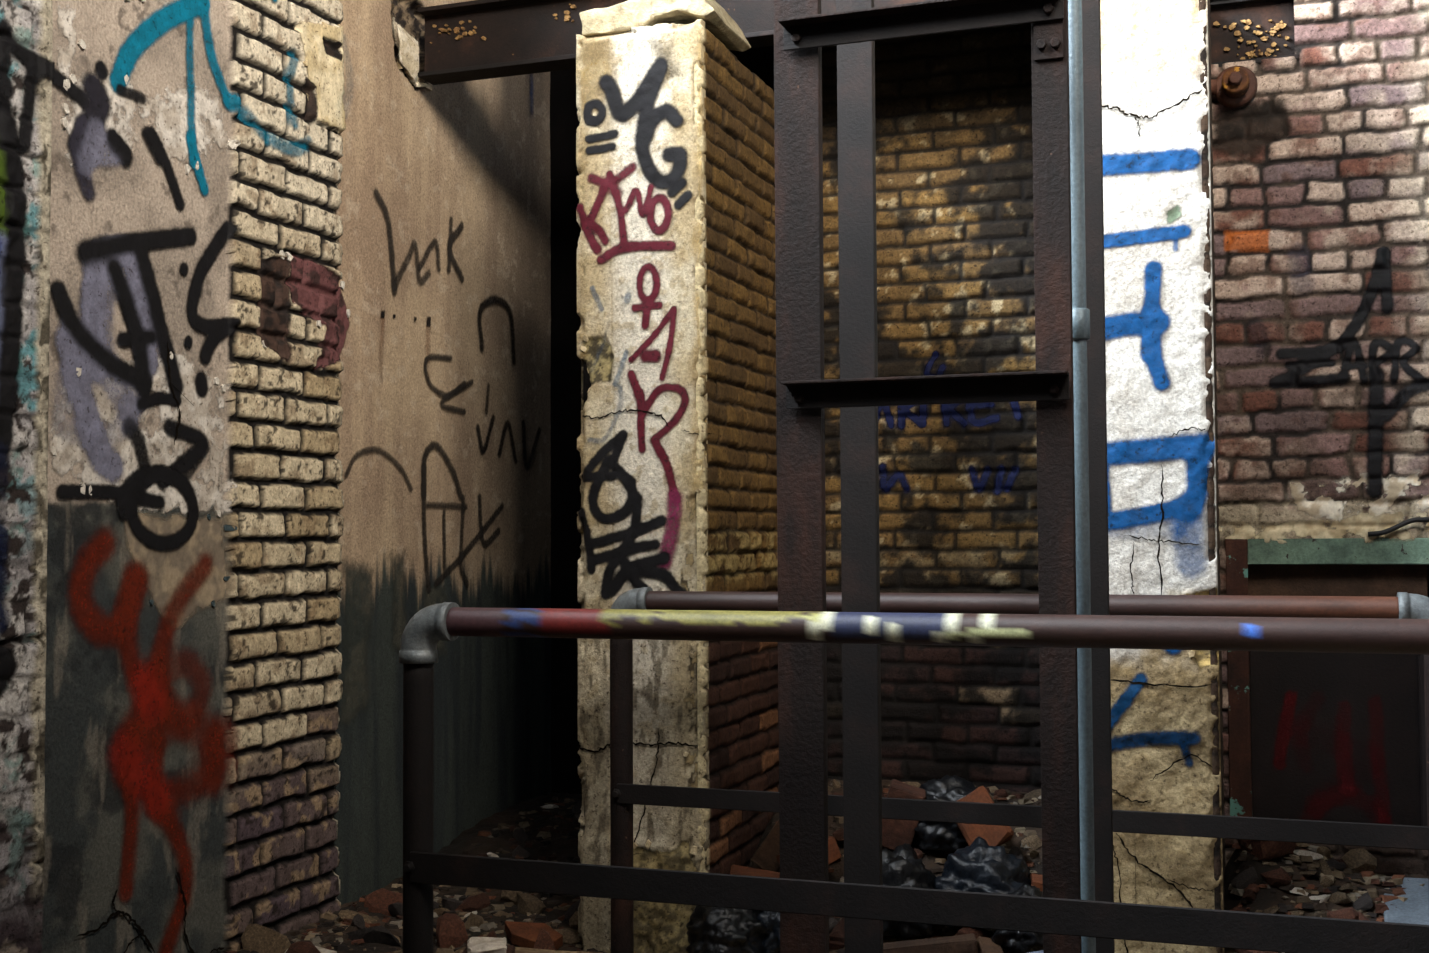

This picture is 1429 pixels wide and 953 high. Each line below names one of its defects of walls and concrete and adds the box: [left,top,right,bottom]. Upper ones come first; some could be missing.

crack [1102,90,1202,138]
water stain [425,588,446,607]
water stain [343,565,373,722]
crack [1112,754,1213,803]
crack [1113,834,1217,908]
crack [76,869,224,953]